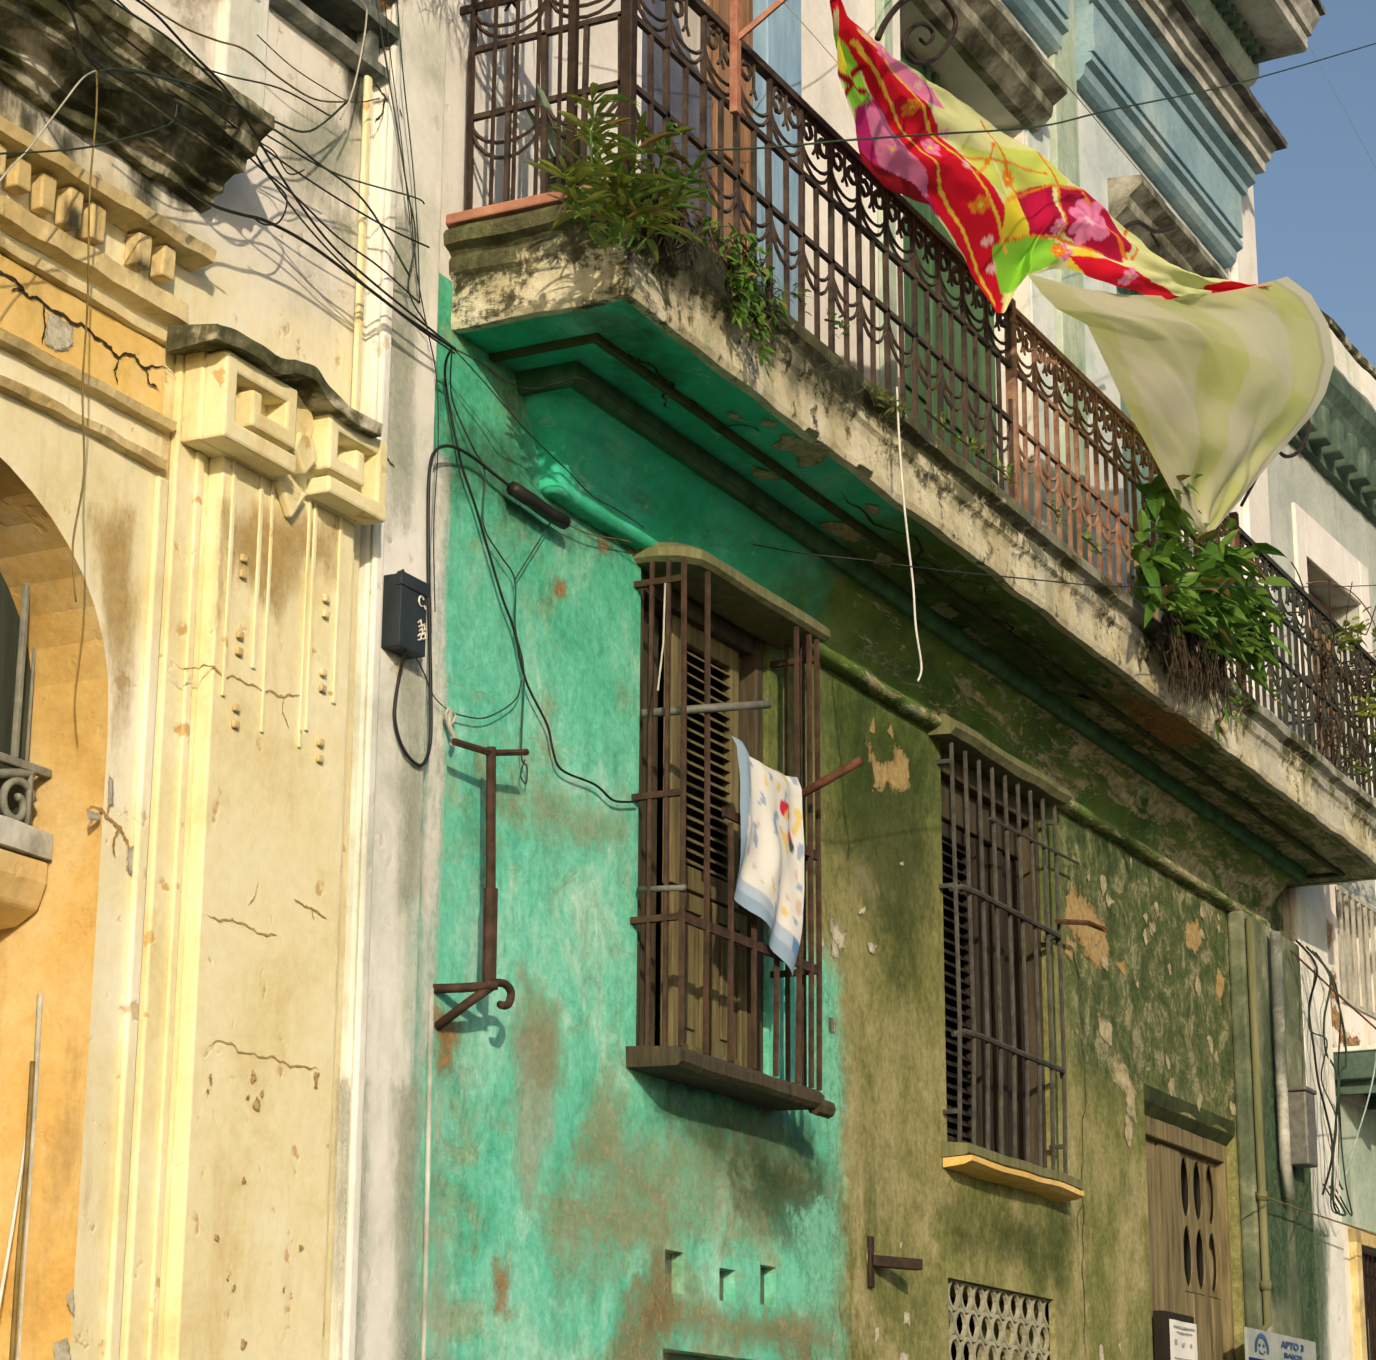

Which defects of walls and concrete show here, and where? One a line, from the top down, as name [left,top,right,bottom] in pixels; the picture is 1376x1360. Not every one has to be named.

damp [0,4,196,157]
damp [132,165,189,207]
crack [0,270,176,390]
peeling [760,419,830,468]
peeling [855,464,873,478]
spalling [865,718,910,794]
spalling [1064,873,1139,988]
peeling [1143,900,1159,945]
crack [209,1040,318,1069]
peeling [1098,1013,1137,1147]
peeling [1166,1053,1174,1096]
flaking render [618,1256,835,1360]